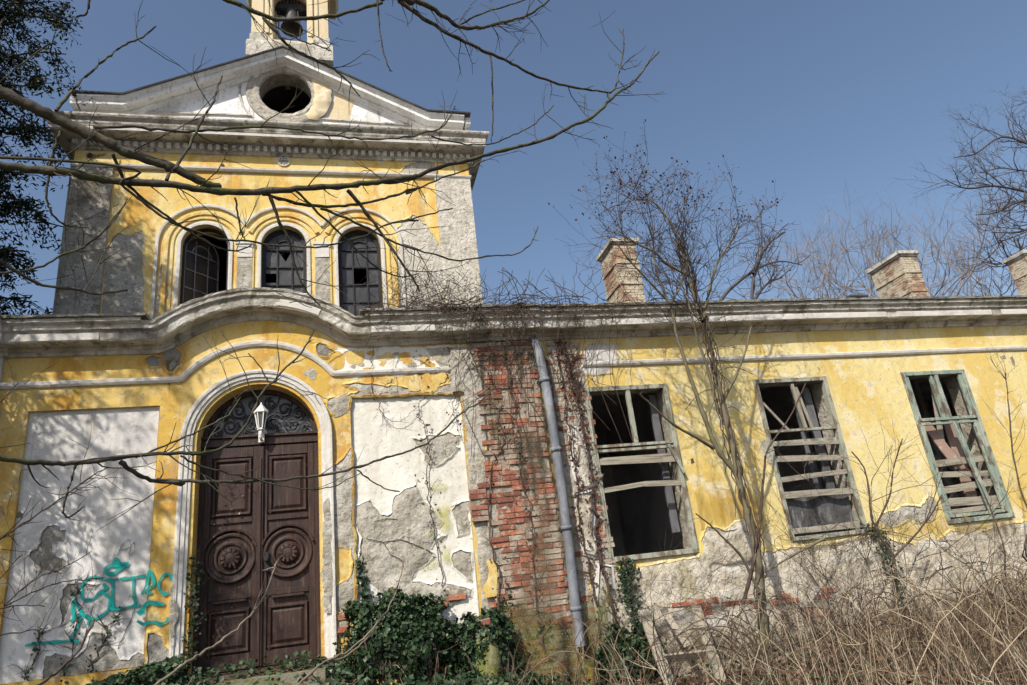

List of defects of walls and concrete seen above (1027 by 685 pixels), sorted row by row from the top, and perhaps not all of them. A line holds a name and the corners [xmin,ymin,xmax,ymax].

peeling [399,162,439,174]
peeling [100,229,167,317]
peeling [389,214,444,308]
peeling [304,340,1027,685]
peeling [27,523,101,628]
peeling [40,584,178,679]